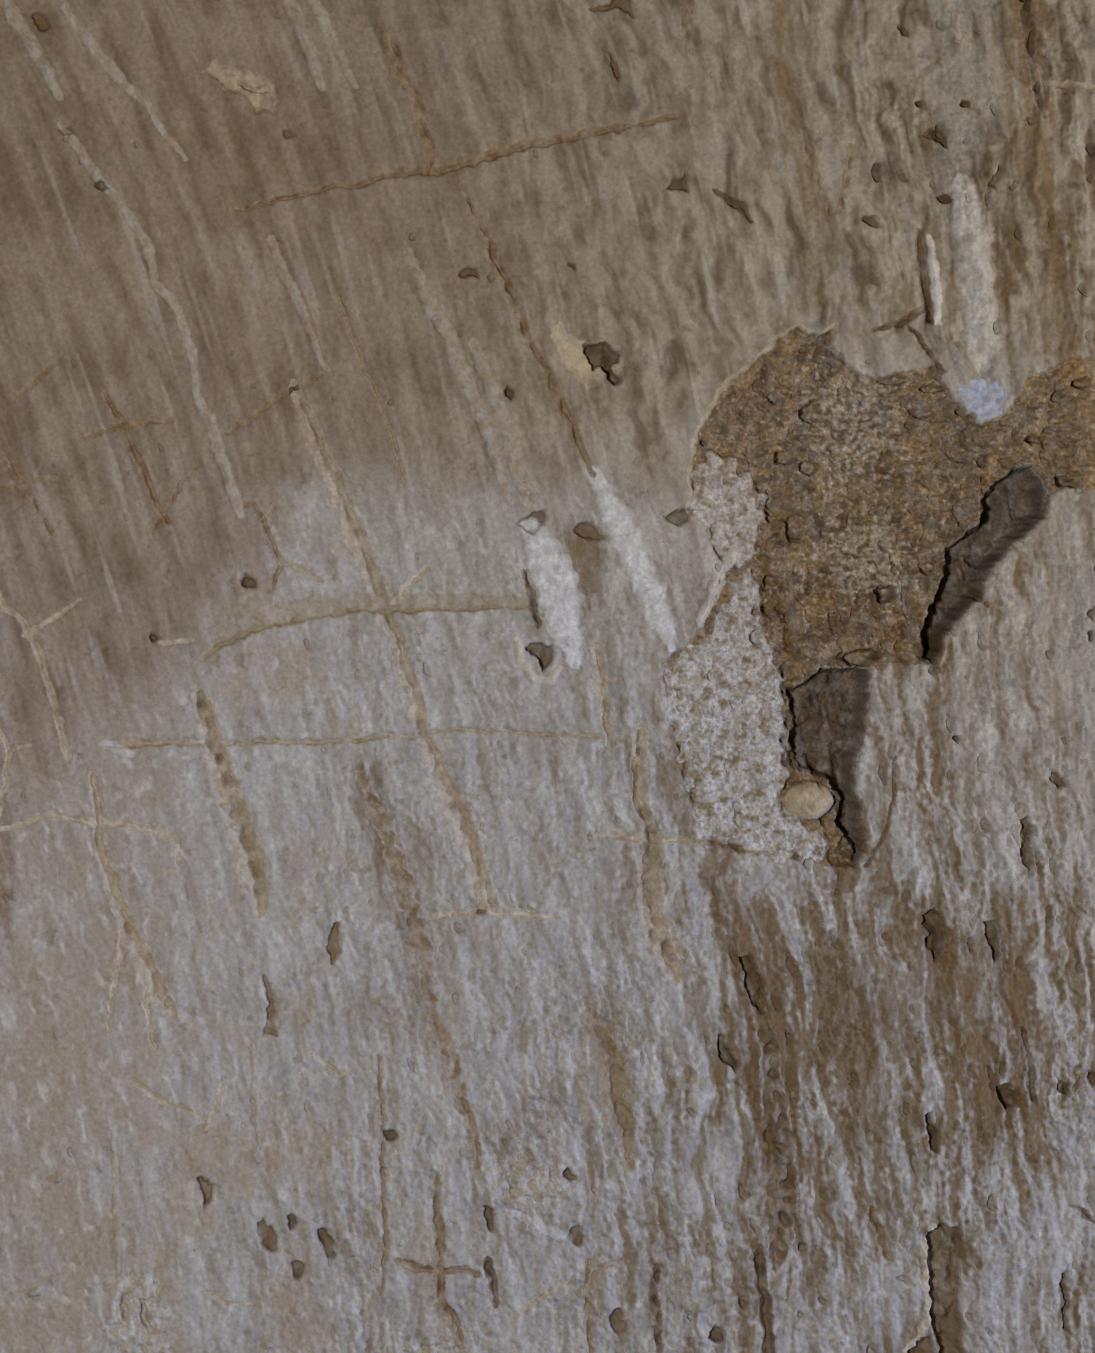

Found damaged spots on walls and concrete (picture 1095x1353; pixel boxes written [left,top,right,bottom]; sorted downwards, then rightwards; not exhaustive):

spalling [665,172,690,193]
spalling [987,165,1004,189]
spalling [712,188,754,225]
spalling [936,192,954,204]
spalling [861,214,882,228]
spalling [915,227,934,325]
spalling [660,321,1095,874]